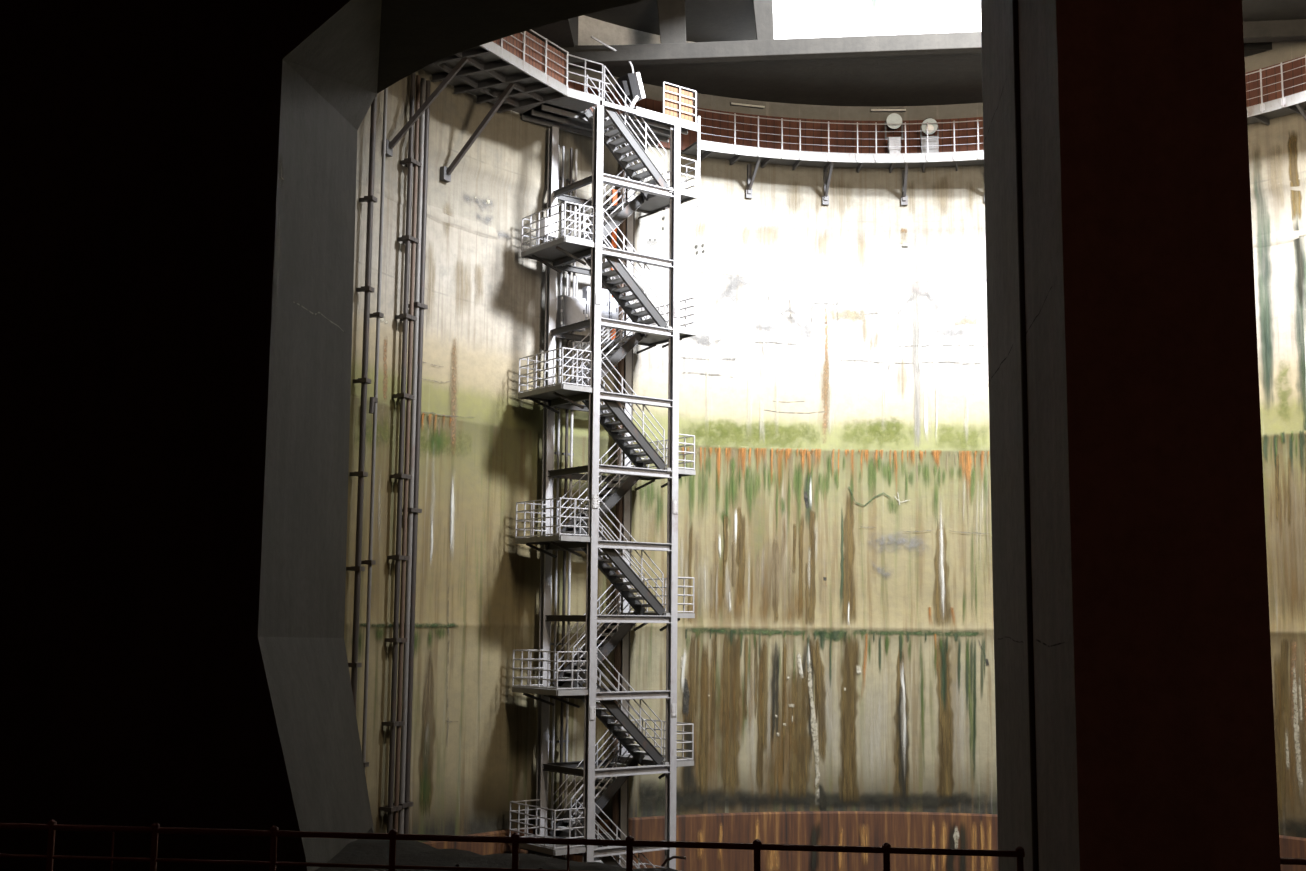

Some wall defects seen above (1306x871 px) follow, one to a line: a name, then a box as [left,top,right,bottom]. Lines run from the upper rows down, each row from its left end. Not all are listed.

damp [1255,182,1272,397]
damp [1288,133,1306,431]
damp [640,496,972,808]
damp [1274,642,1306,838]